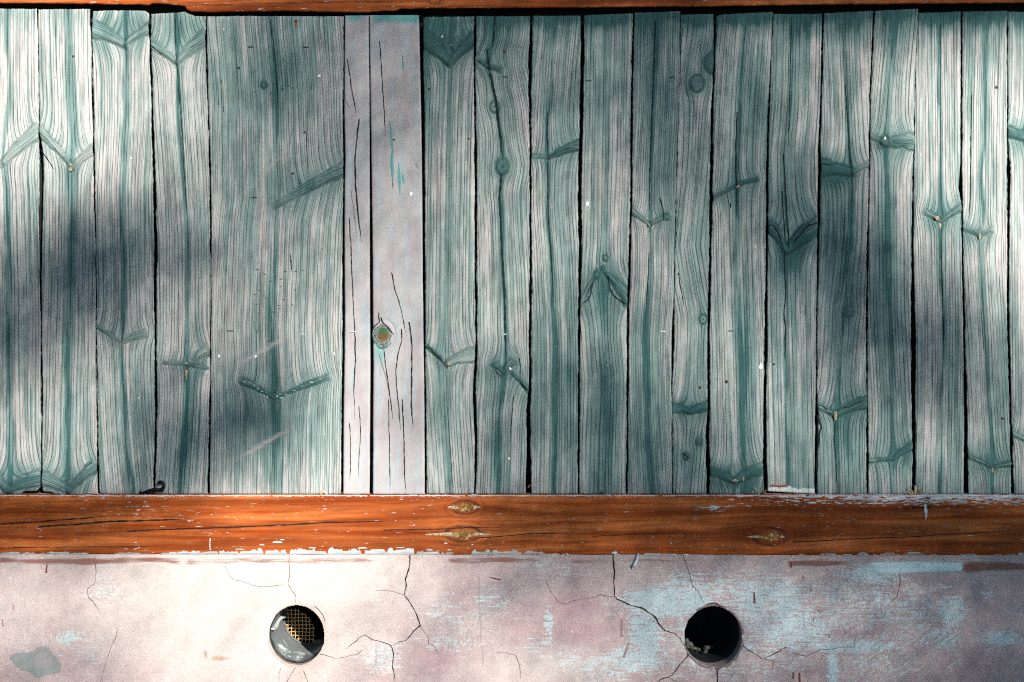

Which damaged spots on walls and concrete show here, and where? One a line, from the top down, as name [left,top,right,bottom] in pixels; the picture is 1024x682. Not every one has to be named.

crack [0,516,556,620]
peeling [161,539,454,555]
peeling [471,544,569,555]
peeling [632,553,689,569]
crack [279,555,438,682]
crack [546,533,722,682]
crack [743,638,856,671]